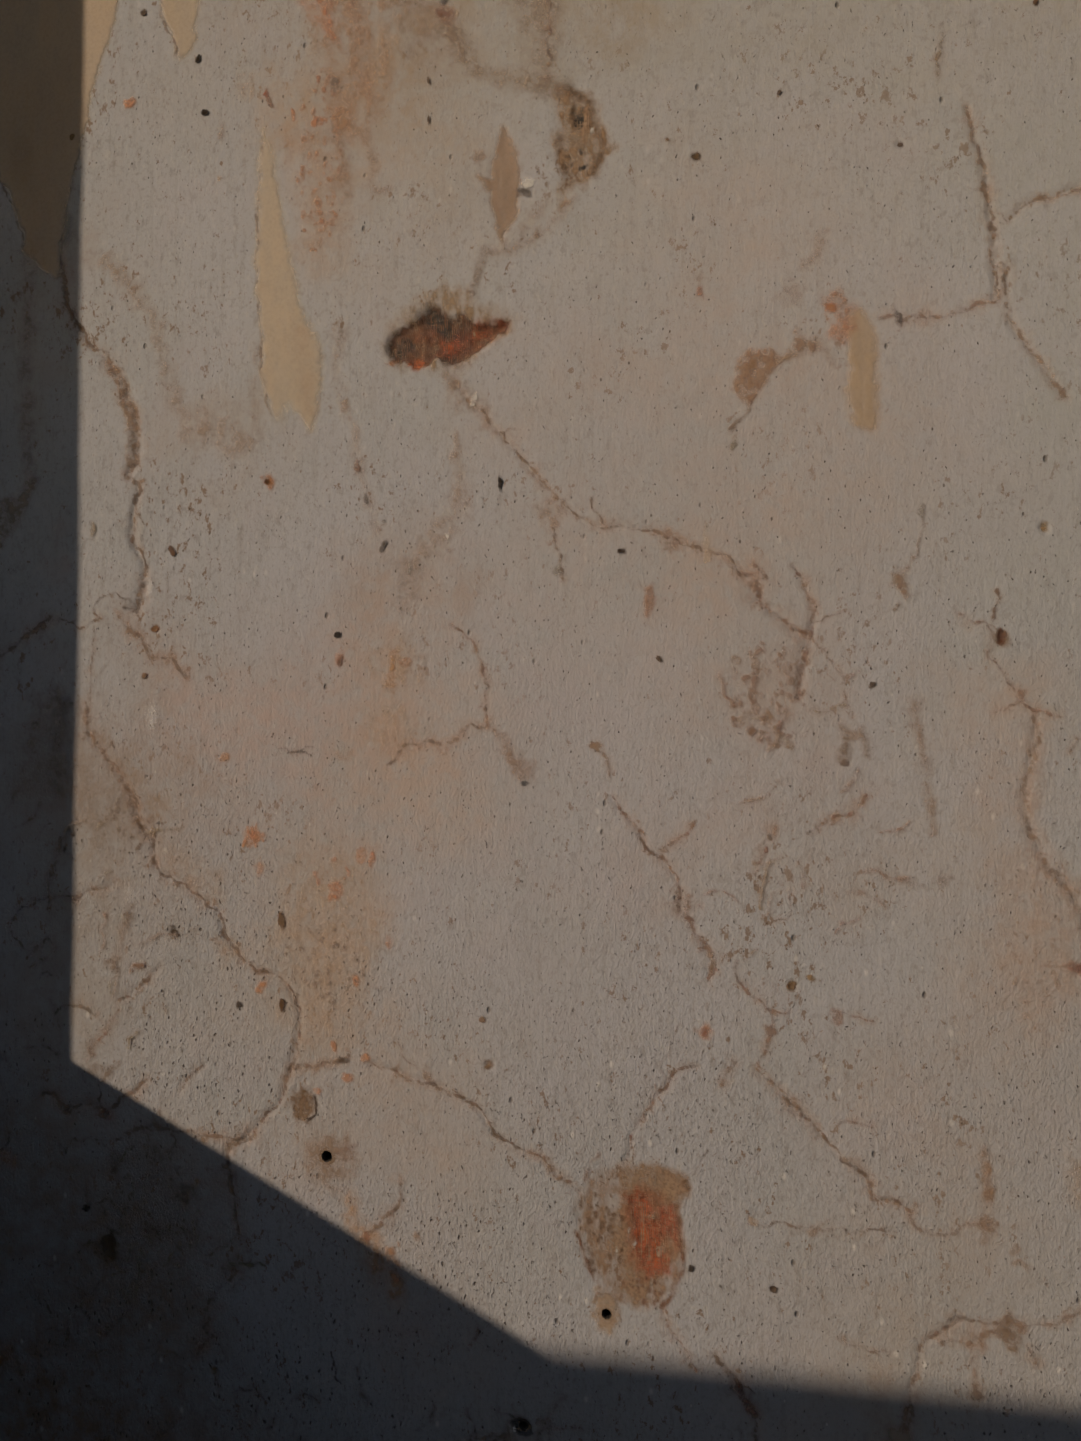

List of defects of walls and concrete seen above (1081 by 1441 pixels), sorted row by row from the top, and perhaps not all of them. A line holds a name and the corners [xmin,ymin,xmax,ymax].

peeling [0,0,117,277]
peeling [480,129,533,238]
flaking render [556,87,609,178]
crack [966,112,1065,396]
crack [9,266,187,678]
crack [643,530,813,663]
crack [45,709,348,1227]
crack [618,807,921,1231]
crack [392,1069,571,1182]
crack [364,1205,398,1234]
crack [695,1356,757,1432]
crack [902,1316,1036,1432]